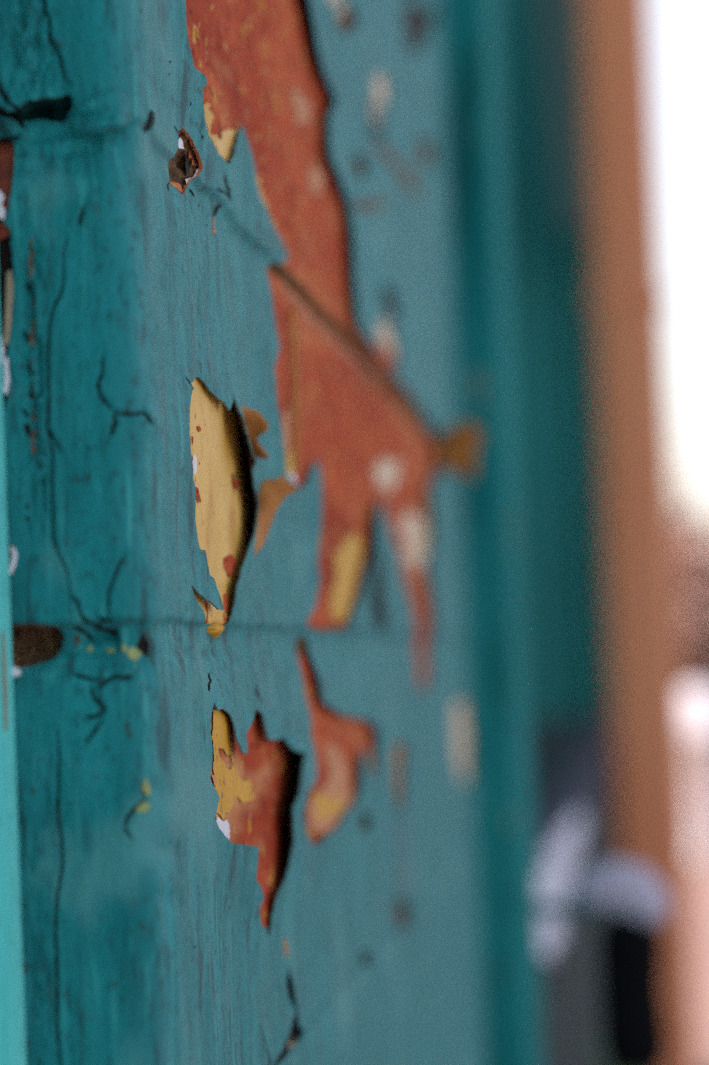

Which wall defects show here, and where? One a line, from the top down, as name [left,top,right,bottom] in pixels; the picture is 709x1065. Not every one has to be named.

crack [46,204,124,644]
crack [96,358,153,437]
peeling [168,0,483,937]
crack [259,939,306,1065]